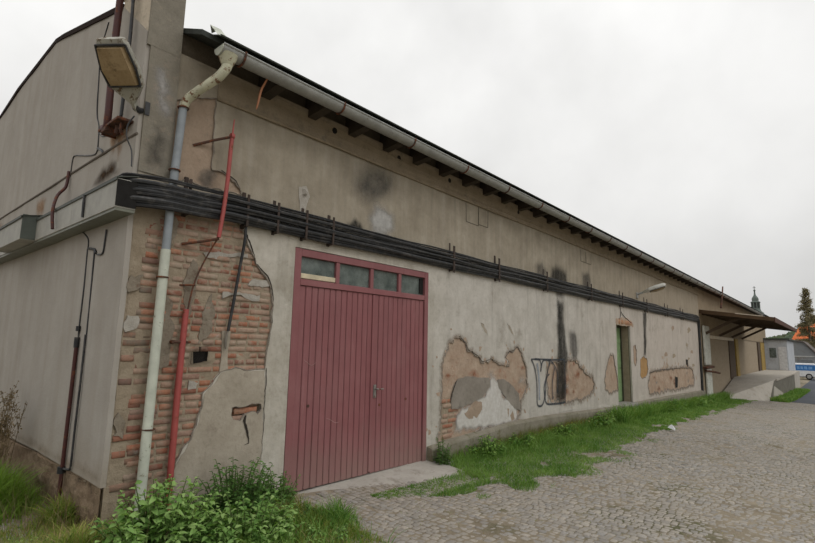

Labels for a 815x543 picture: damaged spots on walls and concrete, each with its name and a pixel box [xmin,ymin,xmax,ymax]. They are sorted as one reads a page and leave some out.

flaking render [106,207,274,528]
flaking render [426,325,530,443]
damp [557,292,577,401]
flaking render [546,349,618,408]
flaking render [633,343,697,395]